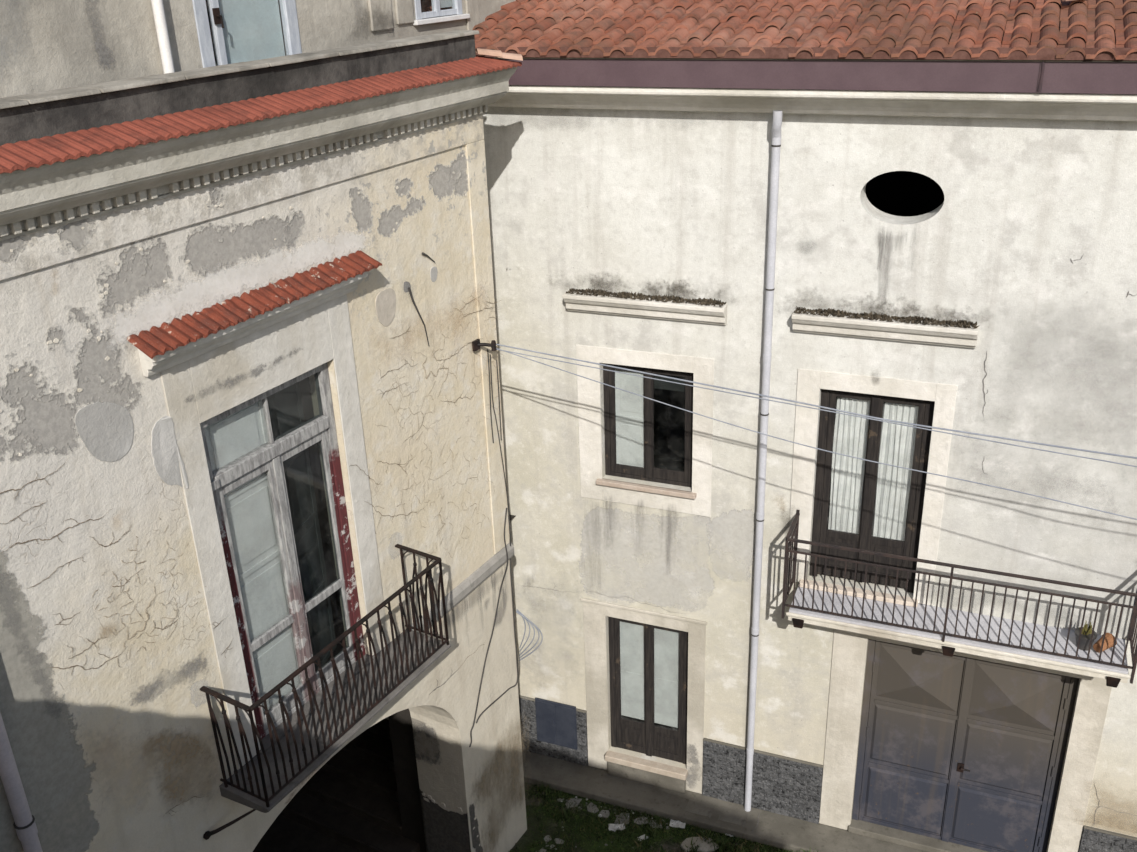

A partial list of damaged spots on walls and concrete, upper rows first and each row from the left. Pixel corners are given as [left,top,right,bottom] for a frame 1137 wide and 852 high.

peeling [0,182,305,463]
peeling [349,150,472,238]
crack [349,295,504,558]
crack [0,457,233,675]